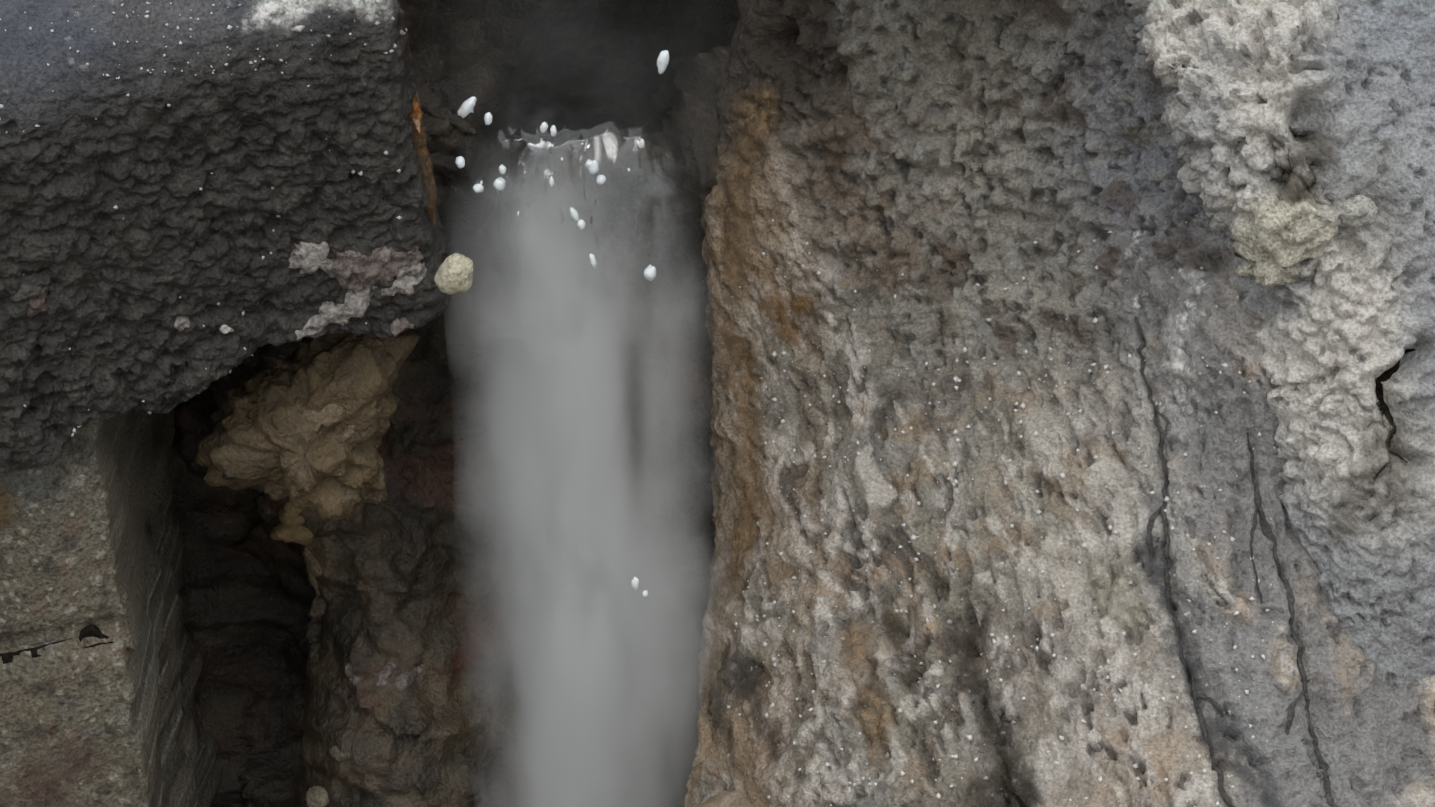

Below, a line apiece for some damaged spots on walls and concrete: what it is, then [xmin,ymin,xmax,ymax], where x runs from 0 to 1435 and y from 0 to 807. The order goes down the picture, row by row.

crack [0,624,115,664]